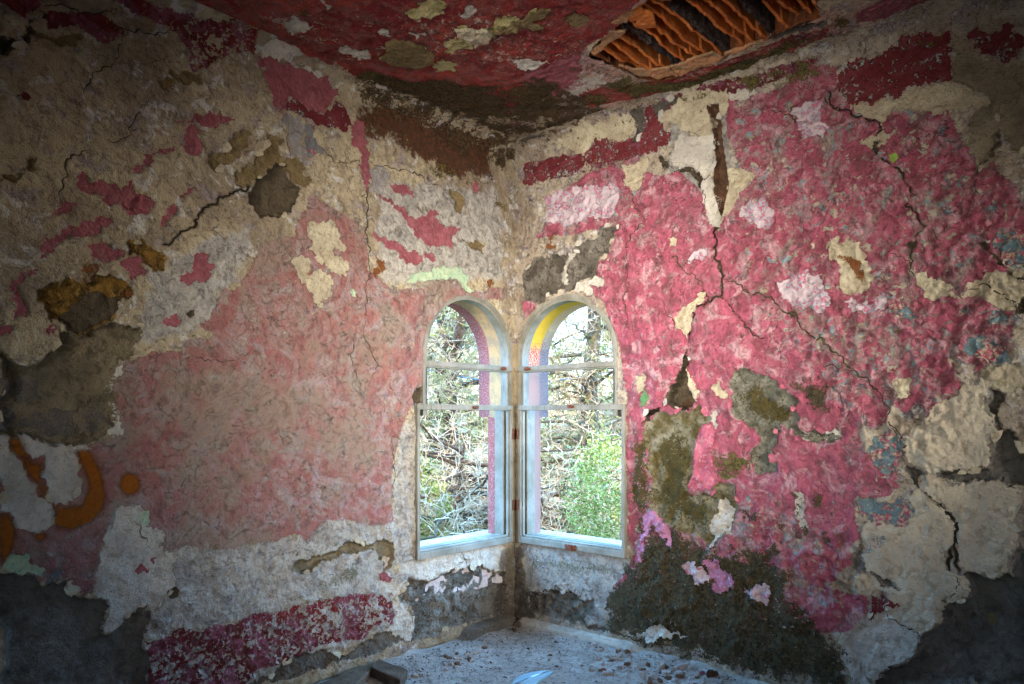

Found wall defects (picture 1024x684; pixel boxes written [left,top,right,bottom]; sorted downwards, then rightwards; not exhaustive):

crack [163,186,250,245]
spalling [0,11,486,534]
leakage [357,101,493,184]
spalling [512,47,775,304]
leakage [737,381,792,431]
crack [661,164,941,452]
mould [789,375,835,413]
crack [767,90,943,275]
spalling [251,538,509,684]
leakage [493,428,855,684]
spalling [838,335,1024,684]
crack [918,487,970,643]